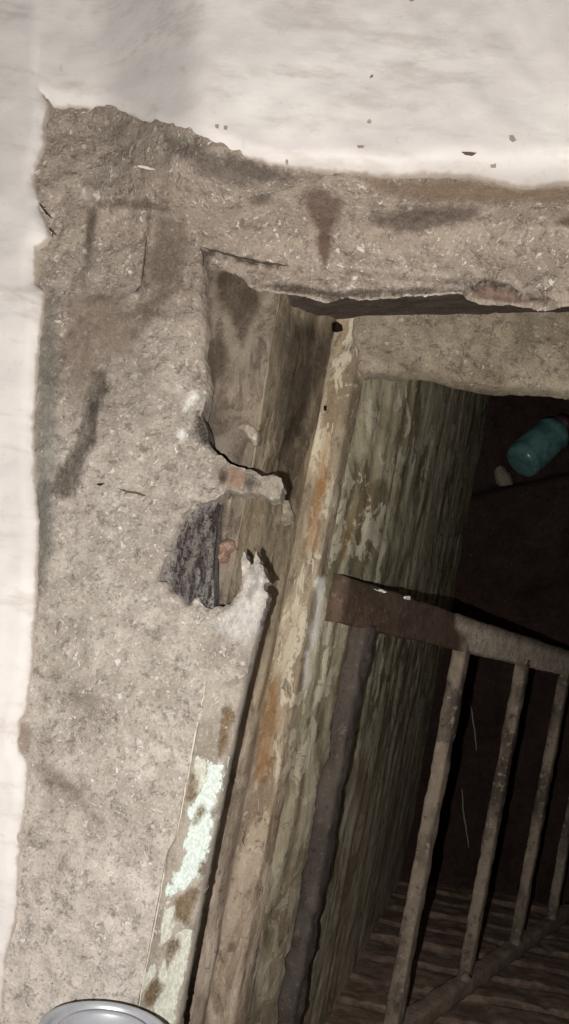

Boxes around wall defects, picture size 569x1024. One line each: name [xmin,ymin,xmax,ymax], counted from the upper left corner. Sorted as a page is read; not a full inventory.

leakage [309,190,339,257]
leakage [370,180,569,231]
crack [136,236,147,291]
leakage [39,375,107,505]